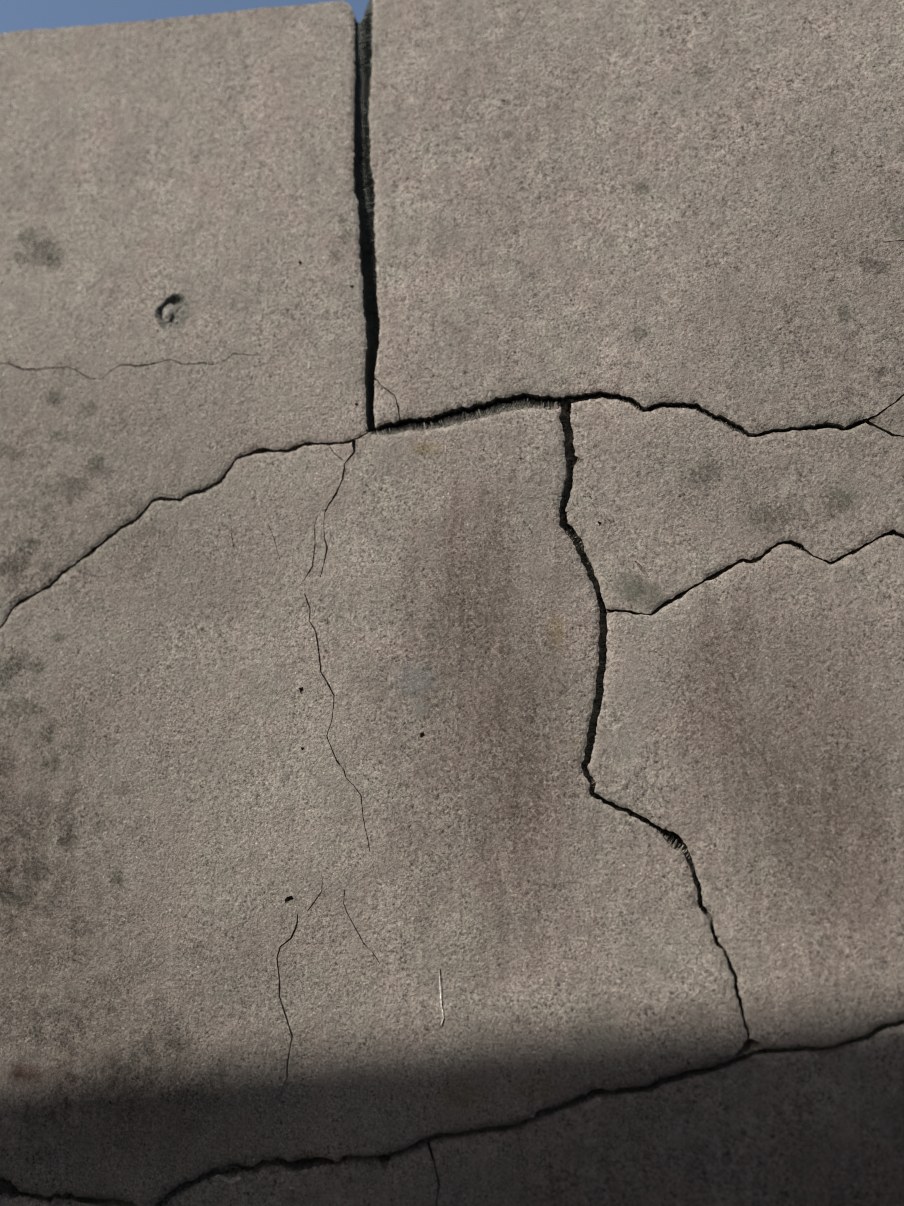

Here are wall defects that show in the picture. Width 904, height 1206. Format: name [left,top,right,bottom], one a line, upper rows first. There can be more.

crack [0,0,904,628]
crack [304,593,370,851]
crack [559,399,904,1039]
crack [0,1178,138,1206]
crack [276,880,381,1100]
crack [154,1019,904,1206]